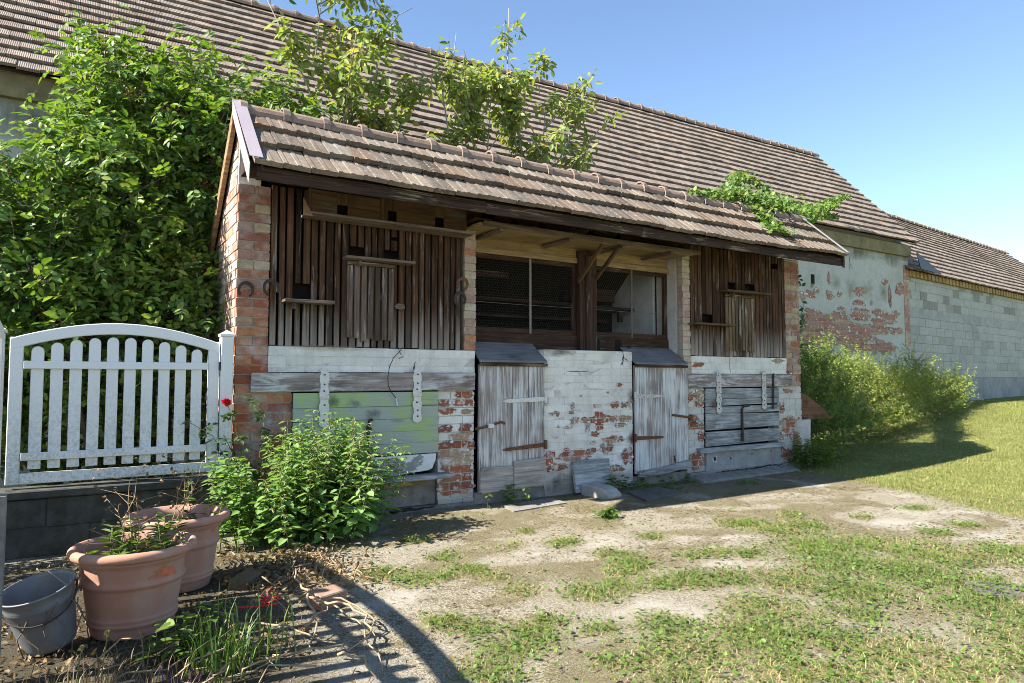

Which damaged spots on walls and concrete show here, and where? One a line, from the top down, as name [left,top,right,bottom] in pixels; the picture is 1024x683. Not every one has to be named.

flaking render [799,272,905,356]
peeling [436,391,476,496]
peeling [545,383,634,472]
peeling [688,388,717,470]
peeling [778,389,803,459]